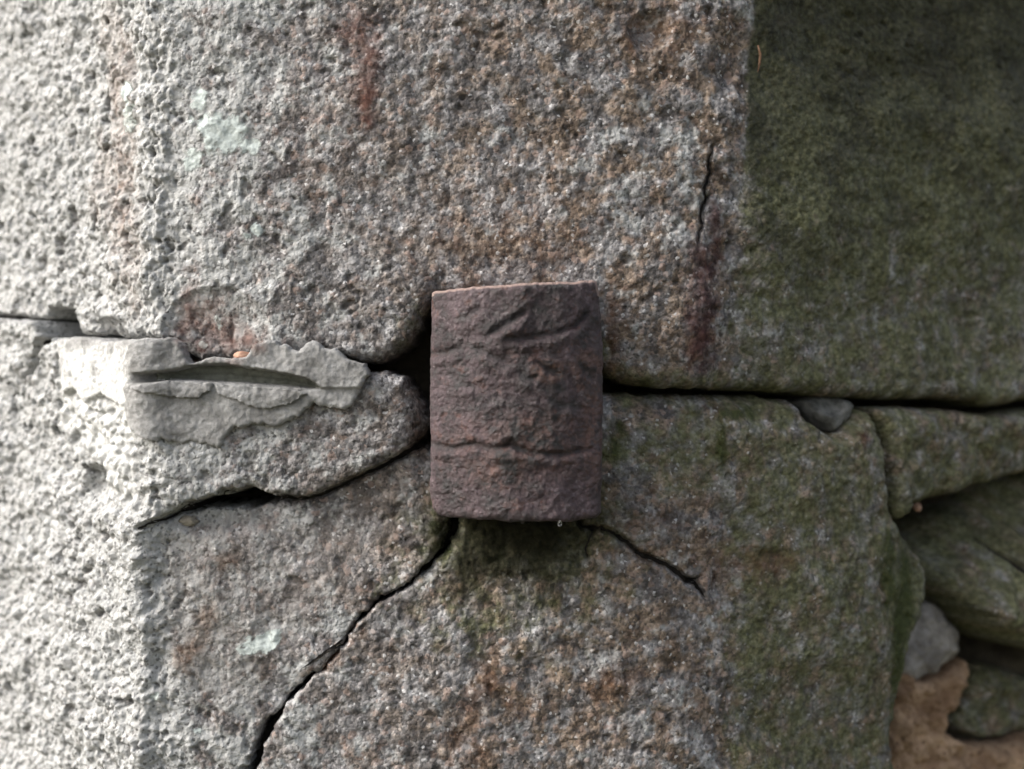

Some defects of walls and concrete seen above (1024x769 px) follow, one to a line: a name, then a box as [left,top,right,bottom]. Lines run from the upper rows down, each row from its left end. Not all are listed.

crack [698,151,713,241]
peeling [57,337,372,517]
crack [138,434,431,530]
crack [577,520,705,597]
crack [254,520,458,769]